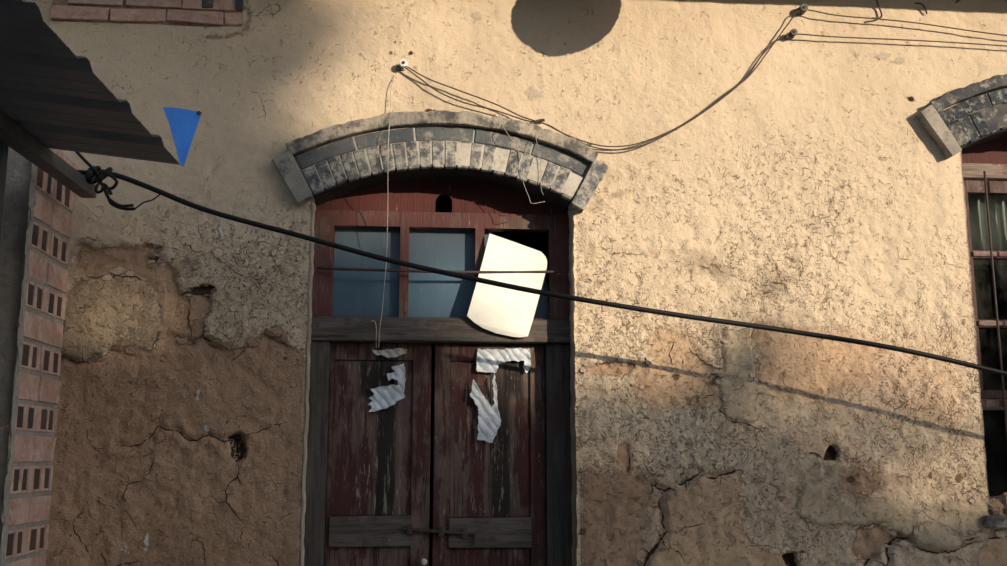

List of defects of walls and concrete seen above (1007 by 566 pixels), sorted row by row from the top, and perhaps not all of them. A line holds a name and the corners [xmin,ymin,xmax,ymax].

peeling [46,239,304,566]
crack [58,412,292,566]
crack [639,454,738,566]
crack [664,338,777,434]
peeling [648,464,803,566]
peeling [580,322,877,430]
spalling [810,445,837,461]
crack [854,497,927,566]
peeling [798,463,1007,566]